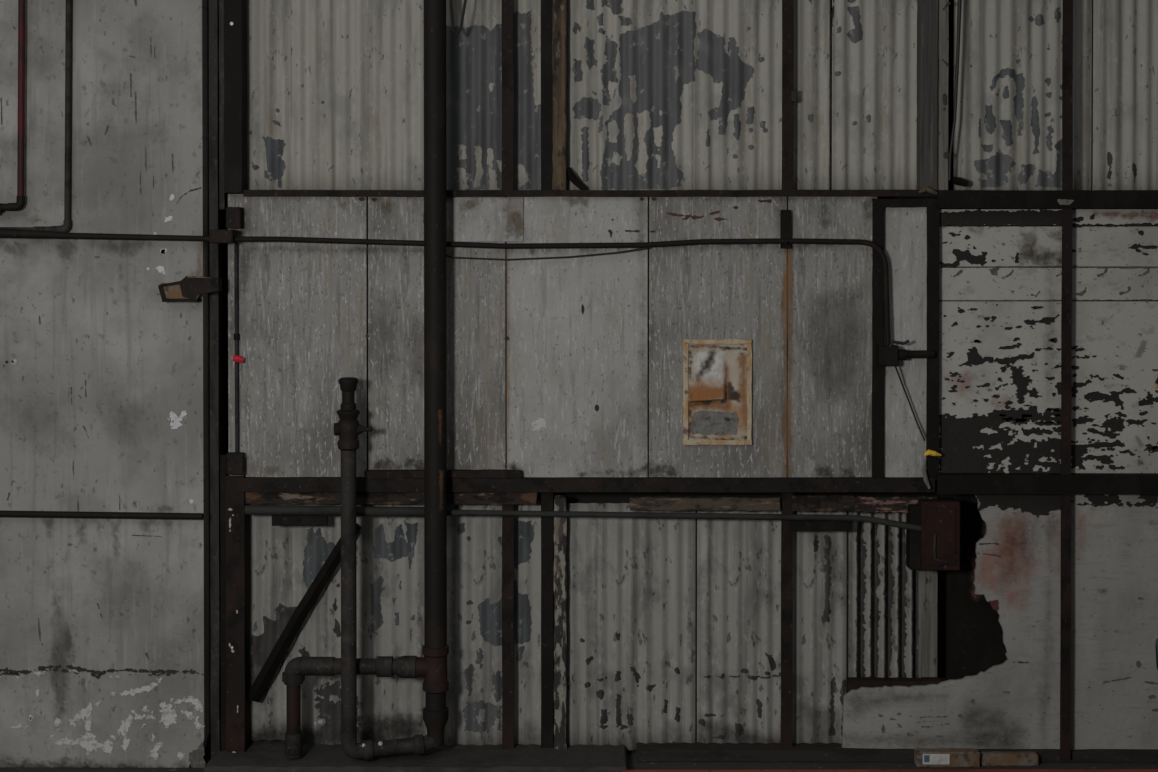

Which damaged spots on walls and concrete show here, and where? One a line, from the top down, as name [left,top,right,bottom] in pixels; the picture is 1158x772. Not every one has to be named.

peeling [446,10,541,190]
peeling [572,0,768,201]
peeling [939,59,1158,301]
corrosion [782,249,793,334]
peeling [939,291,1158,473]
crack [0,665,204,679]
flaking render [48,675,205,760]
peeling [314,678,341,742]
peeling [374,522,418,569]
peeling [462,520,535,734]
peeling [813,535,832,623]
peeling [828,522,919,736]